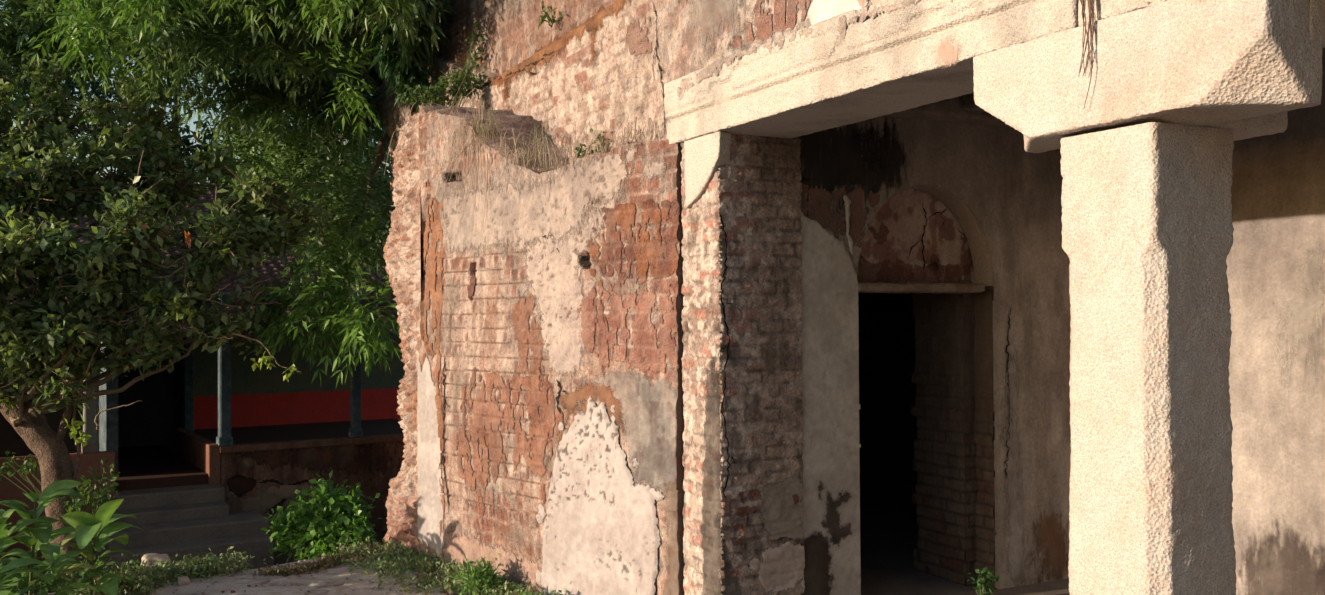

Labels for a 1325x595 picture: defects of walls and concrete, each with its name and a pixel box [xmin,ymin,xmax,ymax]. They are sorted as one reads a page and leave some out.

flaking render [677,0,919,100]
crack [907,208,973,279]
flaking render [417,145,679,595]
crack [719,211,737,501]
flaking render [749,195,972,595]
spalling [731,489,760,546]
leakage [1239,523,1325,595]